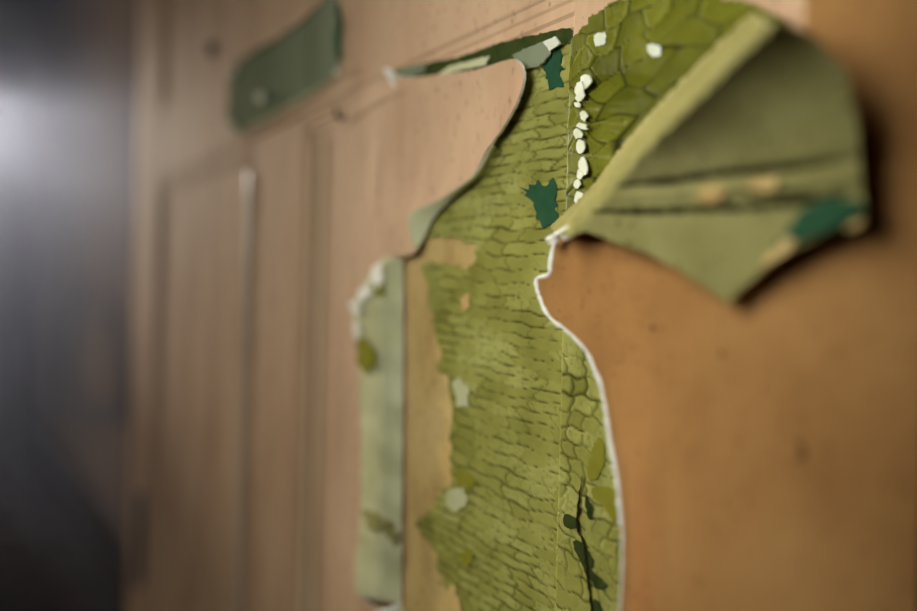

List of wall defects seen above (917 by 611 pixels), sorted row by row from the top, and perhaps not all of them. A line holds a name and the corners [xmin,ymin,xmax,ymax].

spalling [225,0,343,135]
peeling [316,0,917,611]